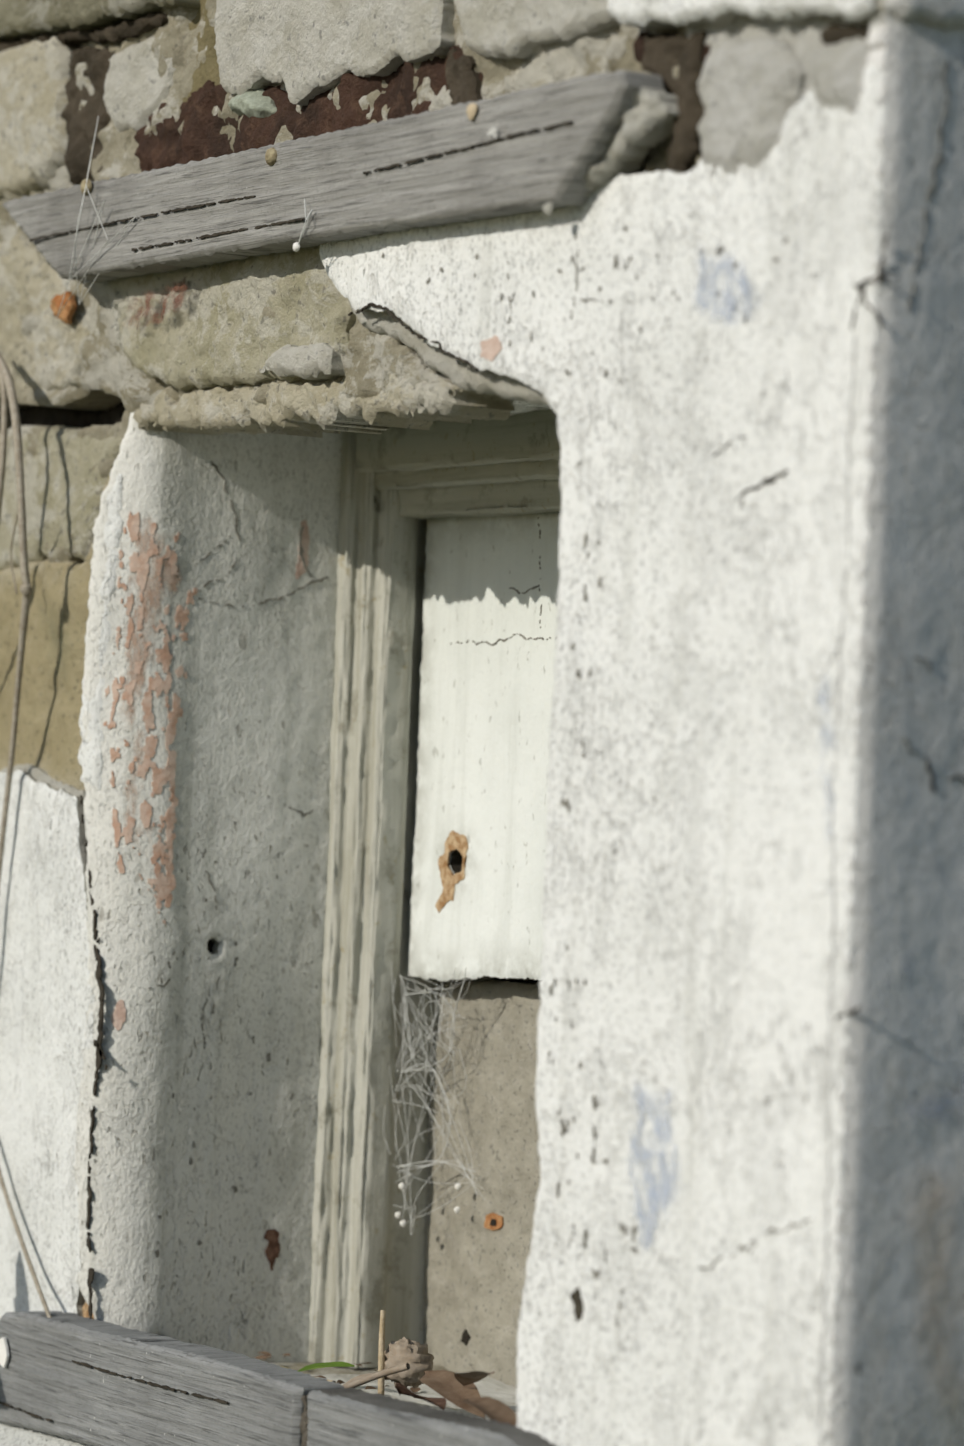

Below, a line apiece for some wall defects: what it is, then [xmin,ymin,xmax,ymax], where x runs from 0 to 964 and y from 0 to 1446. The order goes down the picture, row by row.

crack [505,262,513,324]
crack [570,231,612,319]
crack [348,303,479,371]
spalling [0,0,964,924]
crack [699,61,950,1446]
crack [903,738,964,792]
peeling [111,1000,126,1031]
crack [200,998,208,1049]
crack [80,795,108,1319]
corrosion [264,1229,281,1271]
corrosion [484,1213,503,1231]